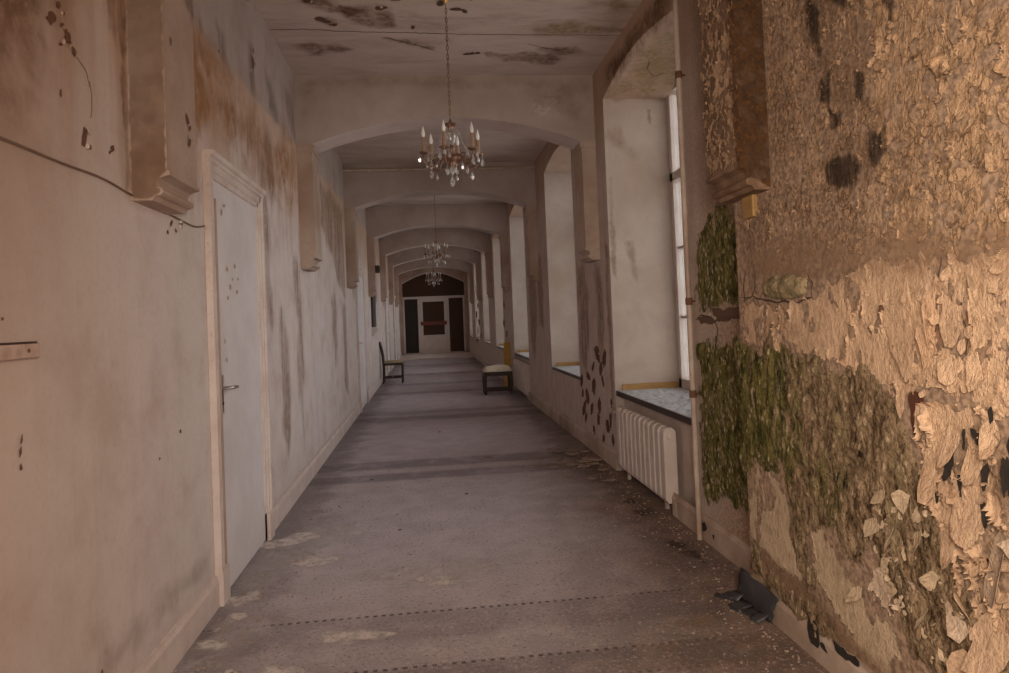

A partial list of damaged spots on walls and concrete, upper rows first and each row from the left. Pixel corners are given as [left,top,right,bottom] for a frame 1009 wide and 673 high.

peeling [45,1,78,58]
damp [807,0,821,56]
damp [820,73,838,127]
damp [856,73,864,100]
peeling [82,127,93,150]
damp [826,152,859,188]
damp [868,131,886,164]
peeling [695,0,1009,673]
peeling [580,346,615,447]